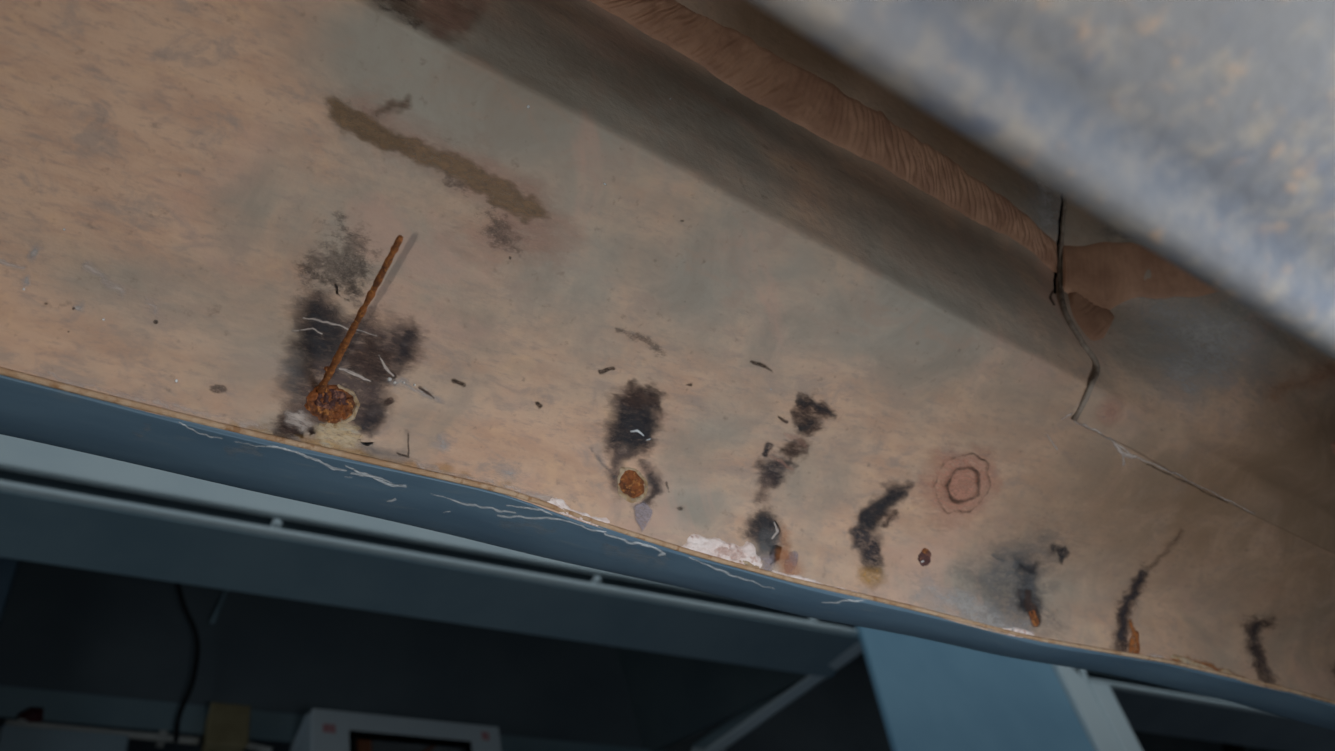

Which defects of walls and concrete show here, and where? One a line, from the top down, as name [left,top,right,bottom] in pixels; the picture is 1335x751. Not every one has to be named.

water stain [328,99,545,240]
crack [1049,196,1063,305]
corrosion [305,384,361,450]
corrosion [617,467,648,503]